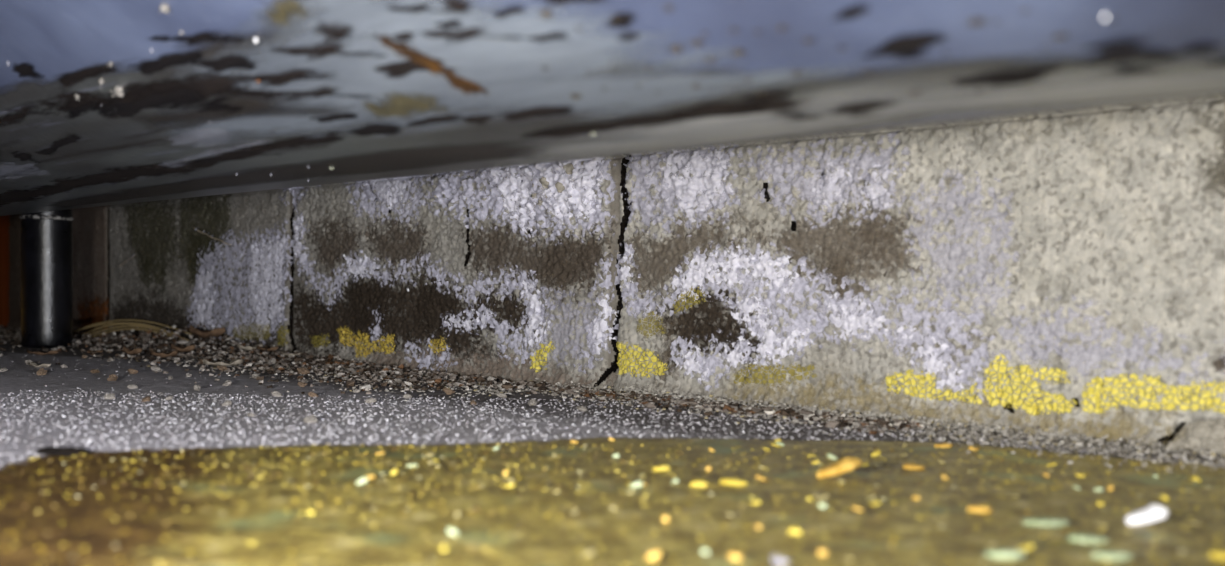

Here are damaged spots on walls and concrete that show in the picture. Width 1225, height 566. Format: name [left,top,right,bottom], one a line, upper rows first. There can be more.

rust [377,35,488,95]
crack [594,155,632,387]
damp [110,131,1212,406]